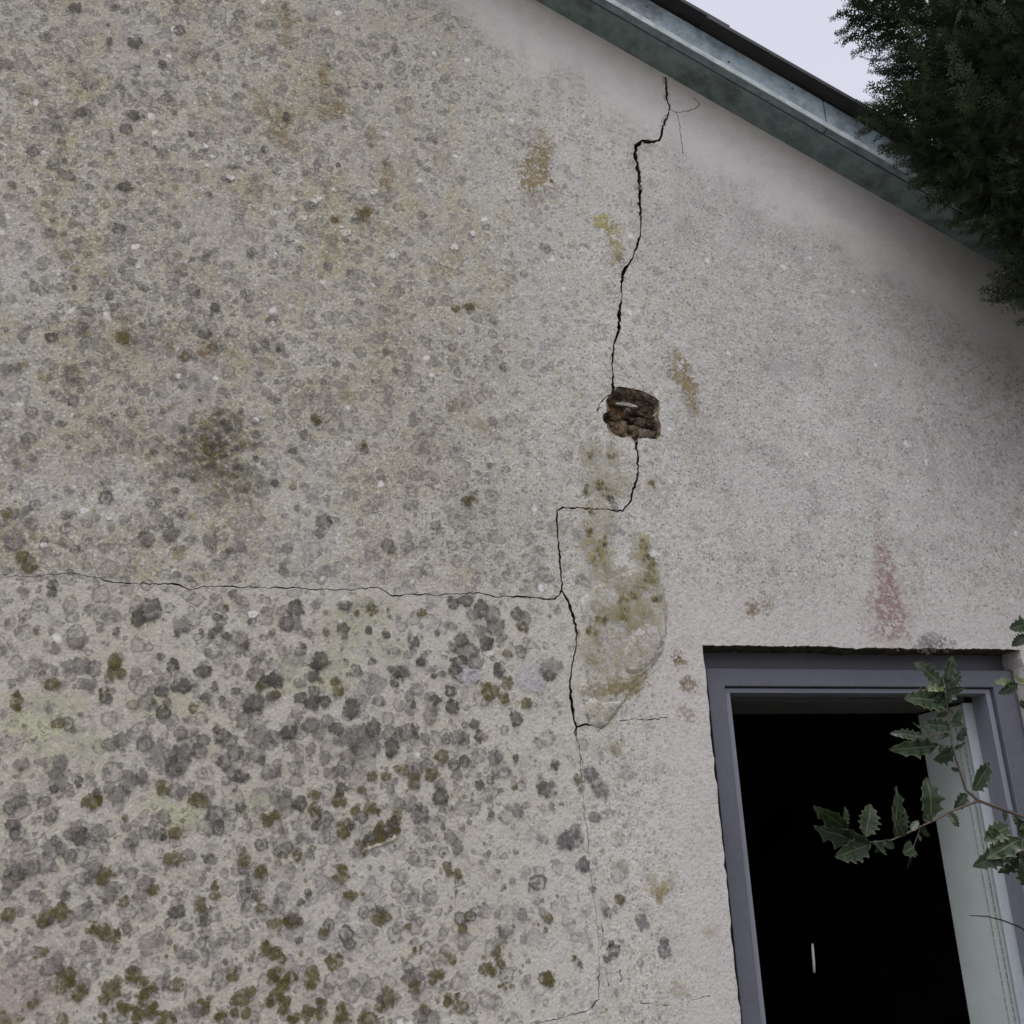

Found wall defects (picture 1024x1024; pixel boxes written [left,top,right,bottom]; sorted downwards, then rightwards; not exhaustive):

crack [596,76,700,411]
spalling [603,386,661,450]
leakage [0,706,76,744]
crack [0,439,668,1024]